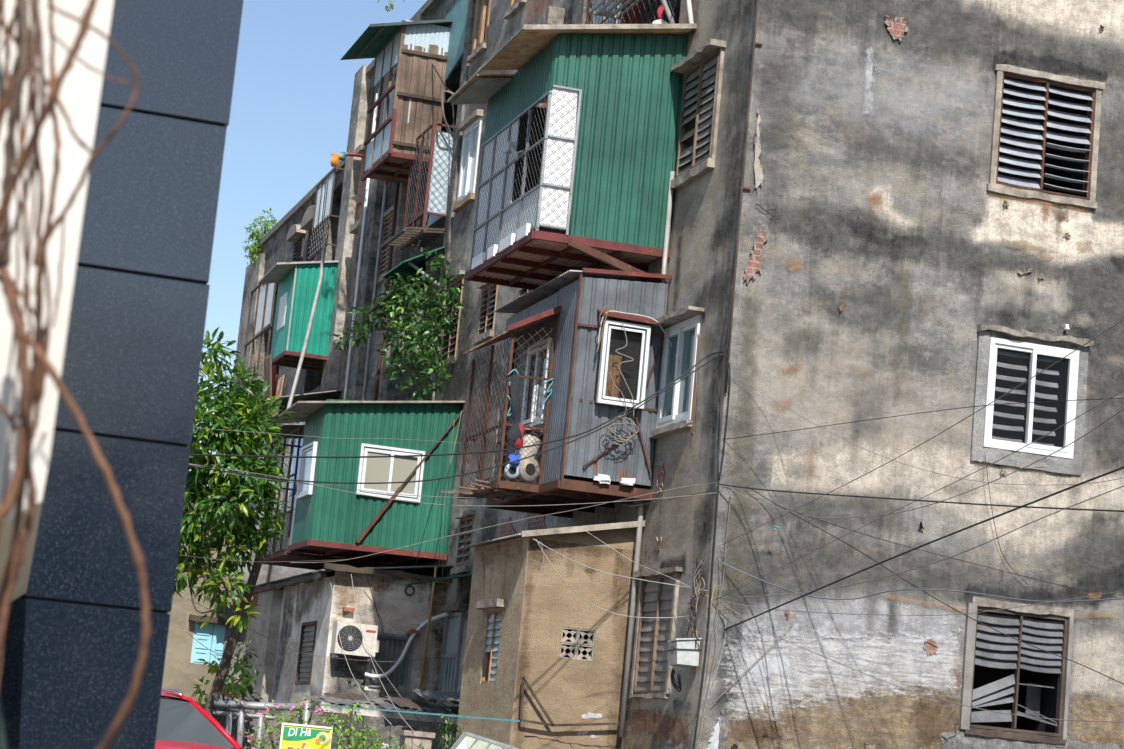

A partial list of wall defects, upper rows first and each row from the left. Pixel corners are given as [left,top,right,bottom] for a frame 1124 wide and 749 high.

flaking render [884,15,908,41]
water stain [768,0,1124,81]
flaking render [968,0,1124,40]
water stain [1096,119,1124,214]
flaking render [744,227,768,283]
water stain [774,205,1124,466]
flaking render [724,598,954,703]
peeling [705,708,738,749]
water stain [720,646,961,749]
water stain [1067,693,1124,749]